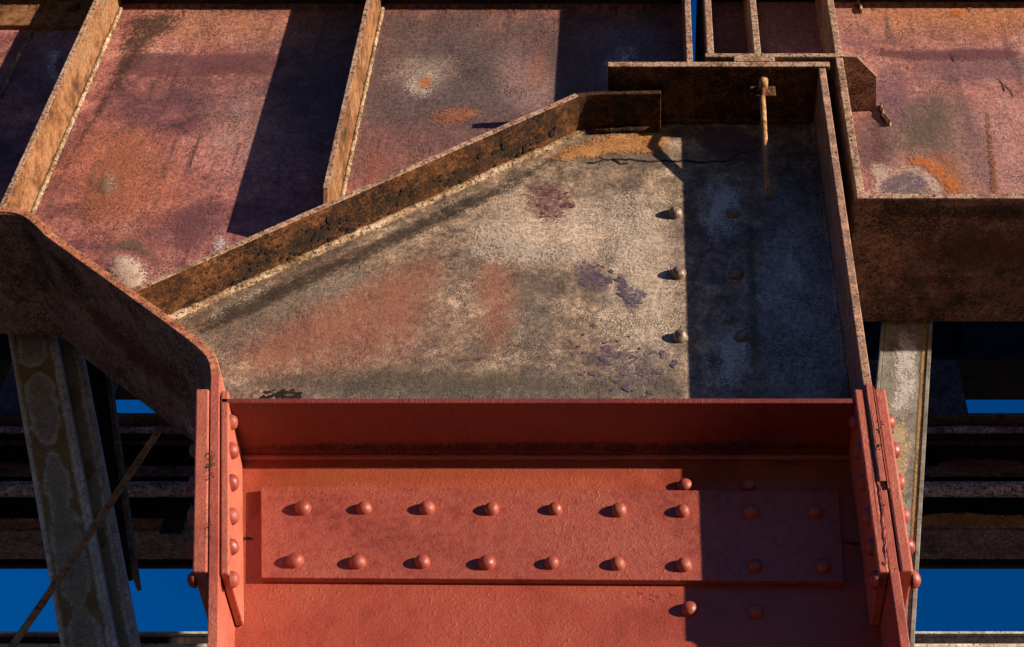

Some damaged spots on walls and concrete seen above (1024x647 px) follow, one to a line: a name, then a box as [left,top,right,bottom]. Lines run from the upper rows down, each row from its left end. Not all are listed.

corrosion [843,0,1019,16]
water stain [407,72,432,94]
corrosion [432,107,479,125]
corrosion [547,132,670,162]
crack [588,152,746,164]
corrosion [873,155,963,194]
spalling [207,126,558,288]
peeling [524,181,575,222]
peeling [575,261,648,311]
peeling [576,324,678,395]